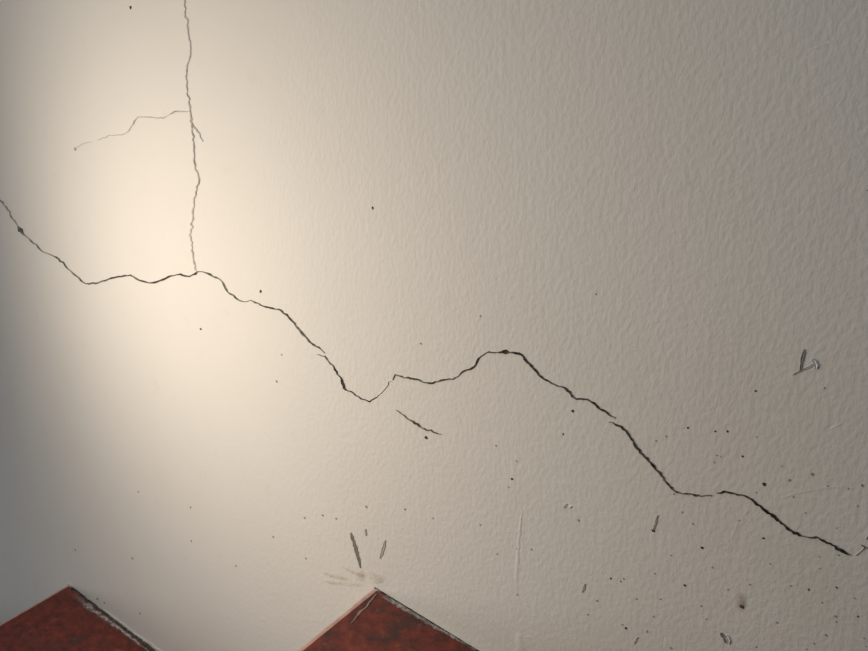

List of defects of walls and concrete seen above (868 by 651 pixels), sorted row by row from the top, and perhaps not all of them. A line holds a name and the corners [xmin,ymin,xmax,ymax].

crack [0,0,712,497]
crack [717,490,851,555]